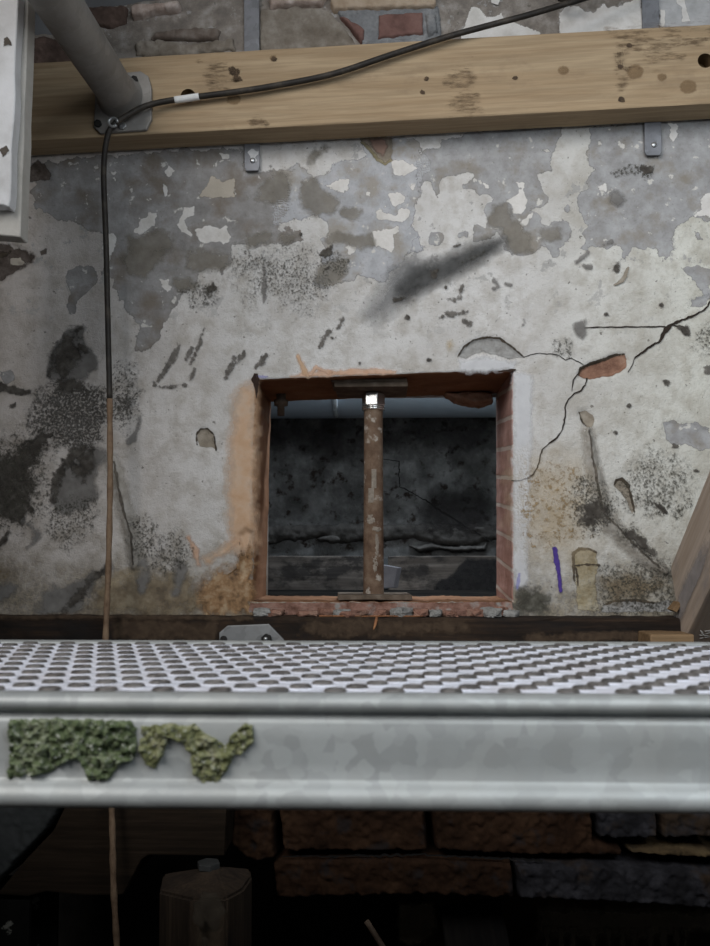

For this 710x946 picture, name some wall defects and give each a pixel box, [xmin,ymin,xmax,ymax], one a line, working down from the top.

flaking render [89,1,182,29]
flaking render [151,27,221,43]
spalling [269,0,441,44]
peeling [30,119,710,352]
spalling [458,336,626,379]
crack [585,301,710,372]
damp [0,326,141,547]
spalling [196,428,217,451]
crack [511,374,588,481]
corrosion [187,387,256,615]
damp [37,517,197,615]